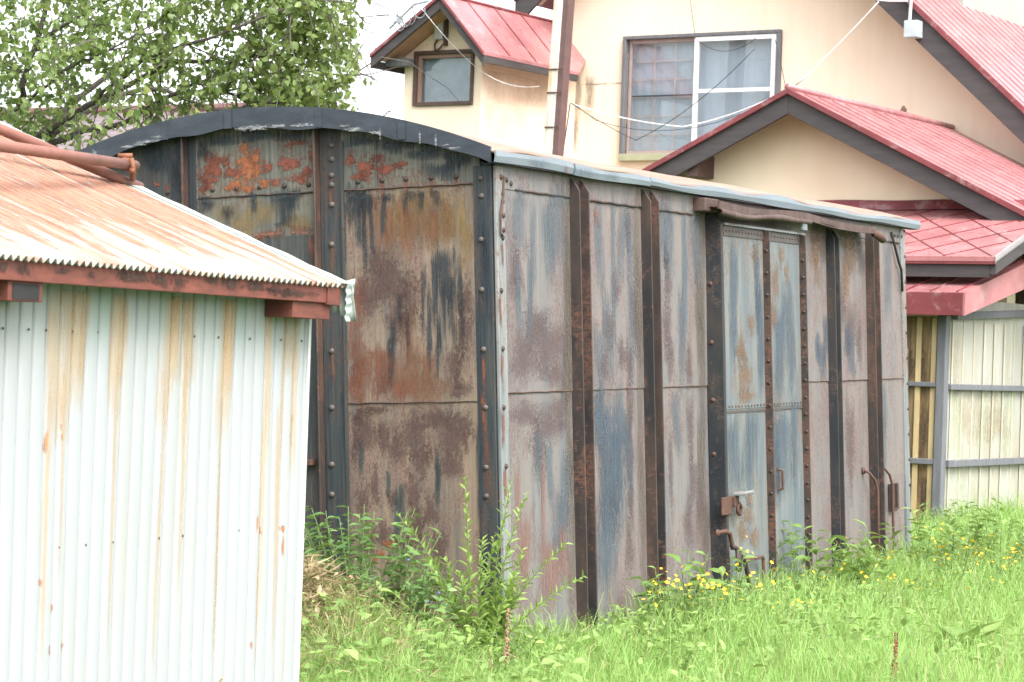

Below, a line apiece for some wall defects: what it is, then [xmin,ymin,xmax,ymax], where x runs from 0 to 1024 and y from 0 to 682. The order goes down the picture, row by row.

rust [0,135,324,279]
rust [348,279,417,403]
rust [735,315,754,404]
rust [503,467,569,593]